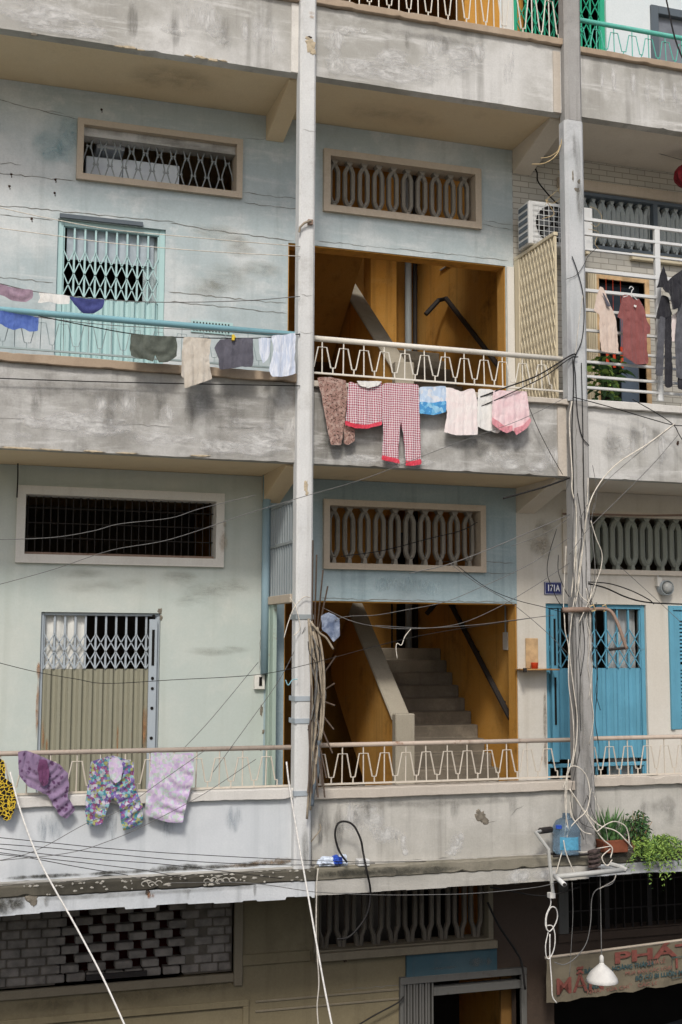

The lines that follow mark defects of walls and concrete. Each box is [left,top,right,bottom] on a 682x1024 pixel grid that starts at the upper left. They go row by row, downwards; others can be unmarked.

spalling [305,36,316,55]
damp [25,394,135,434]
damp [144,418,295,454]
spalling [475,809,489,825]
spalling [23,880,108,907]
peeling [120,869,310,895]